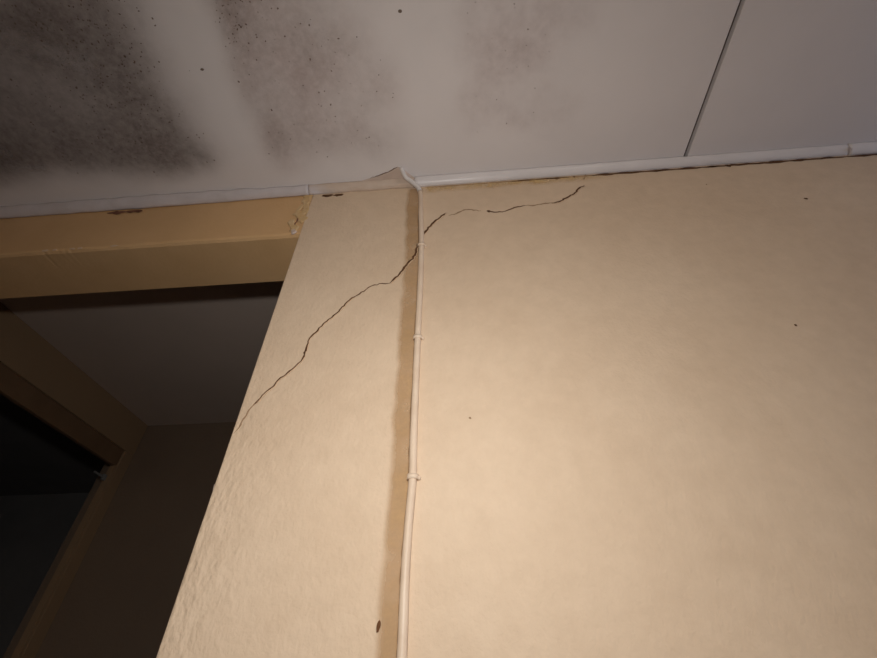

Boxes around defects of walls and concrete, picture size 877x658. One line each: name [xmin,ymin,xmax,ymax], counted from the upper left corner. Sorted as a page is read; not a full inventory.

damp [0,0,184,173]
crack [234,146,877,658]